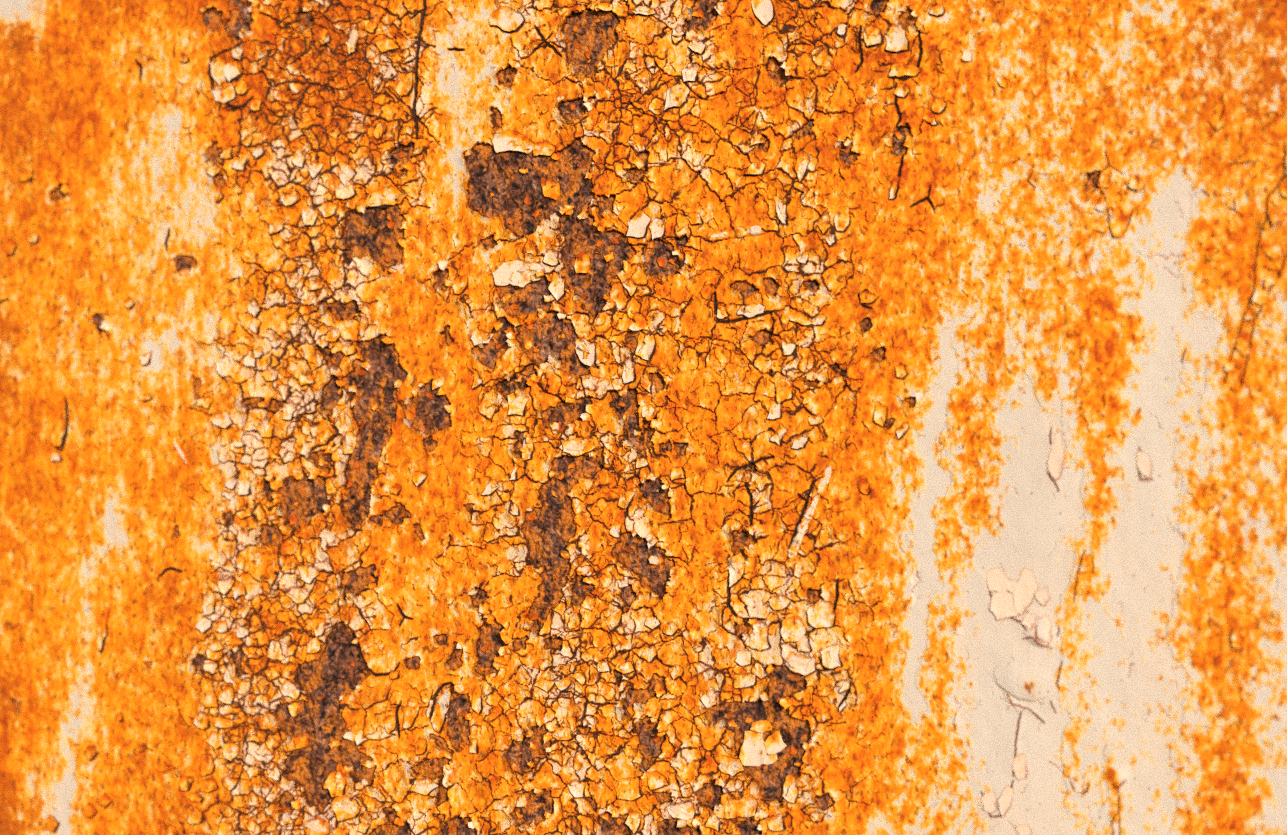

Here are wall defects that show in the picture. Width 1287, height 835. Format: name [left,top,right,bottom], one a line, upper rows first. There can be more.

peeling [464,0,688,400]
corrosion [735,0,760,52]
corrosion [0,0,265,835]
peeling [276,564,379,823]
peeling [254,335,452,552]
corrosion [342,0,552,794]
peeling [384,447,605,835]
crack [160,0,934,835]
peeling [612,529,676,609]
corrosion [674,374,726,607]
peeling [699,664,811,835]
corrosion [811,0,1287,835]